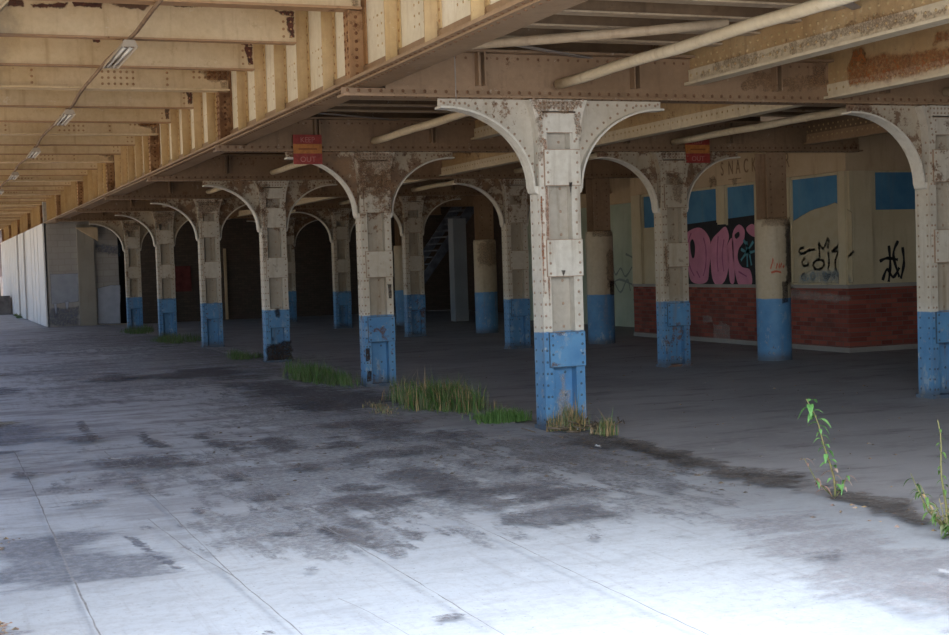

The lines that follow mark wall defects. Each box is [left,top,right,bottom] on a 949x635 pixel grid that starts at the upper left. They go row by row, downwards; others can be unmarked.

corrosion [275,10,294,38]
corrosion [847,32,949,85]
corrosion [532,99,582,161]
corrosion [541,186,550,299]
leakage [487,482,615,525]